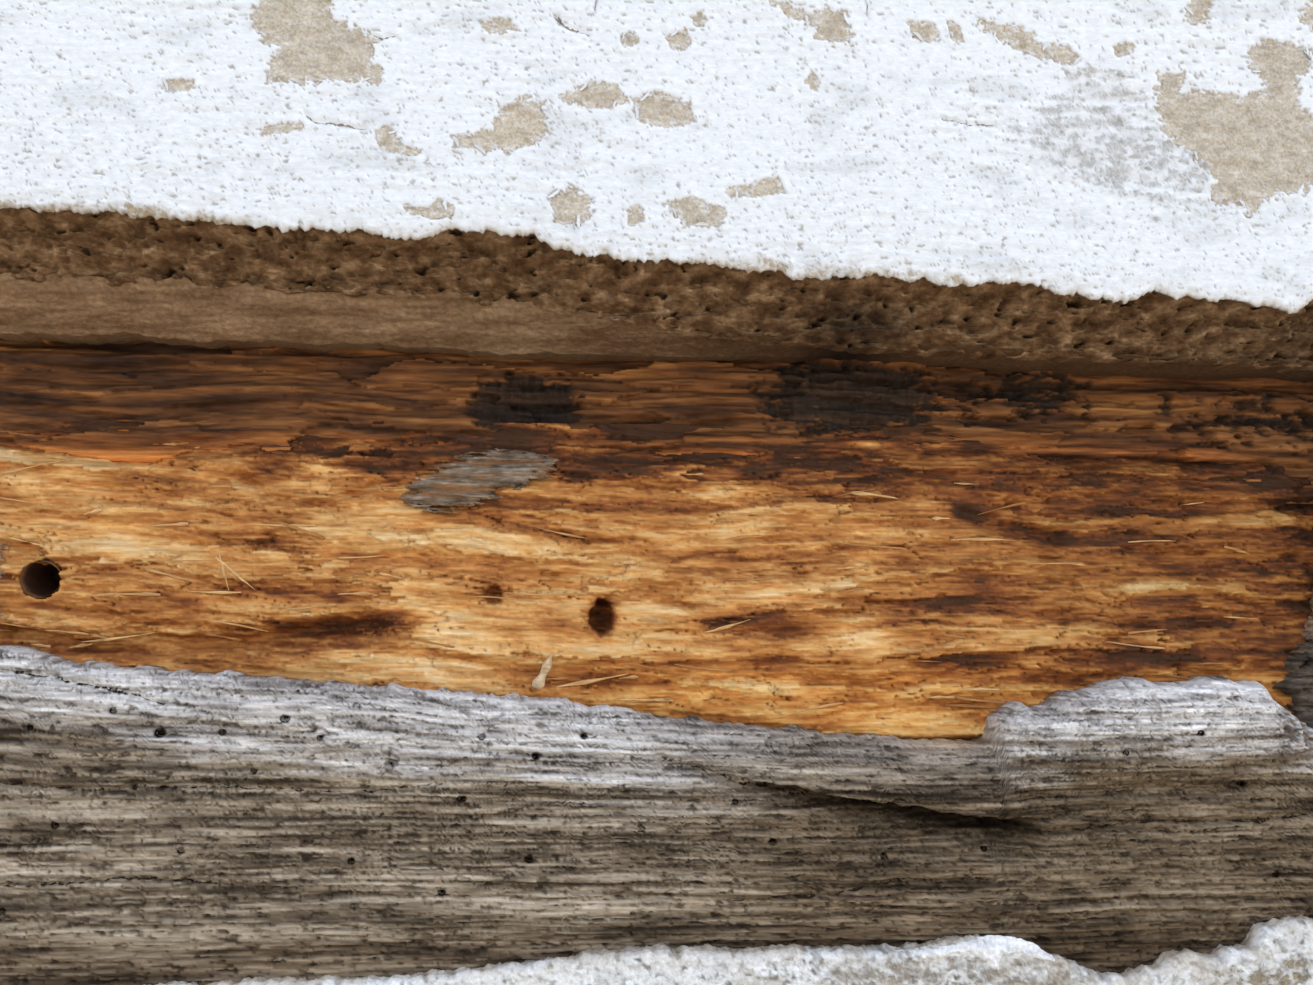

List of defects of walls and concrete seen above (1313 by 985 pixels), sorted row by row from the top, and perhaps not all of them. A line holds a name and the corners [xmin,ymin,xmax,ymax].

peeling [251,0,382,86]
peeling [907,21,963,43]
peeling [1184,0,1215,25]
peeling [1299,0,1313,32]
peeling [451,95,551,155]
peeling [559,83,697,128]
peeling [977,18,1313,218]
peeling [627,206,645,226]
peeling [912,935,1055,970]